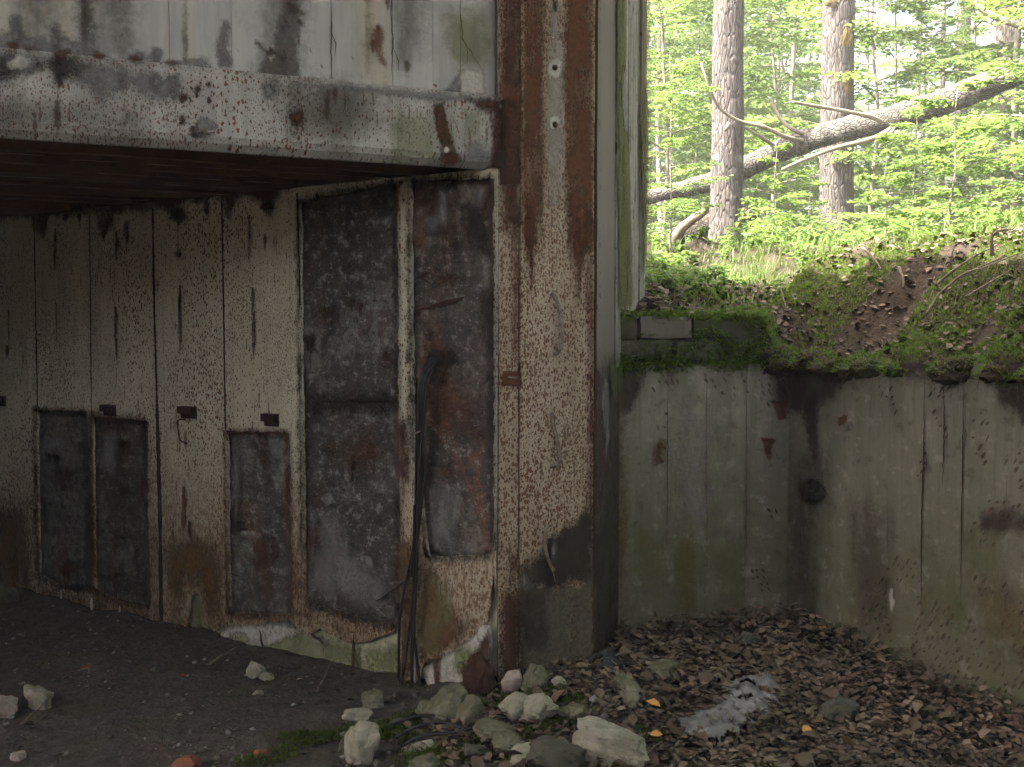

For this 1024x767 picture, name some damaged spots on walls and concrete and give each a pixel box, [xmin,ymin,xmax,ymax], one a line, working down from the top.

damp [0,0,180,100]
rust [0,0,548,681]
damp [526,357,646,653]
damp [776,354,852,459]